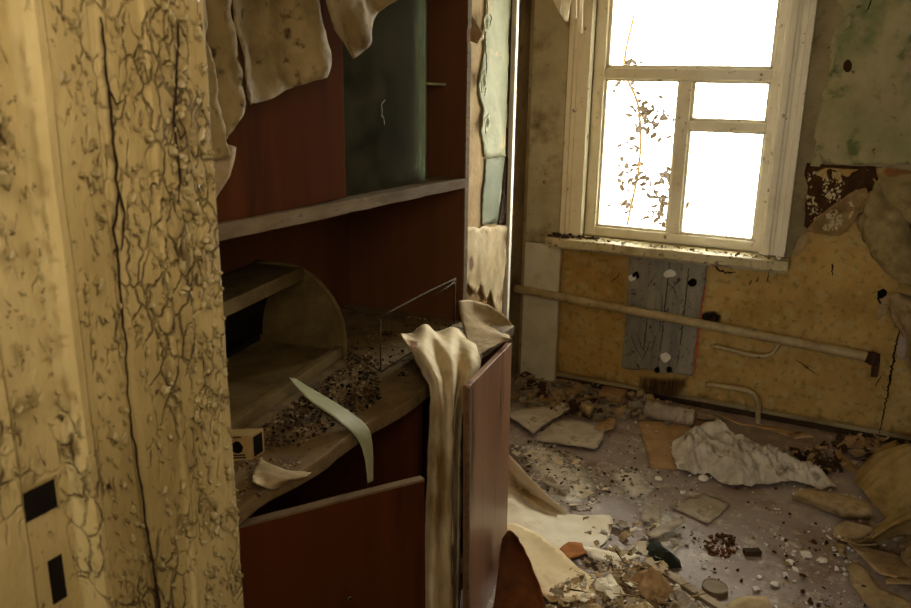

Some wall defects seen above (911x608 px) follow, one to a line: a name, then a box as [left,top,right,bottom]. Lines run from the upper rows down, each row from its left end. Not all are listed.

crack [99,17,161,608]
crack [875,331,900,434]